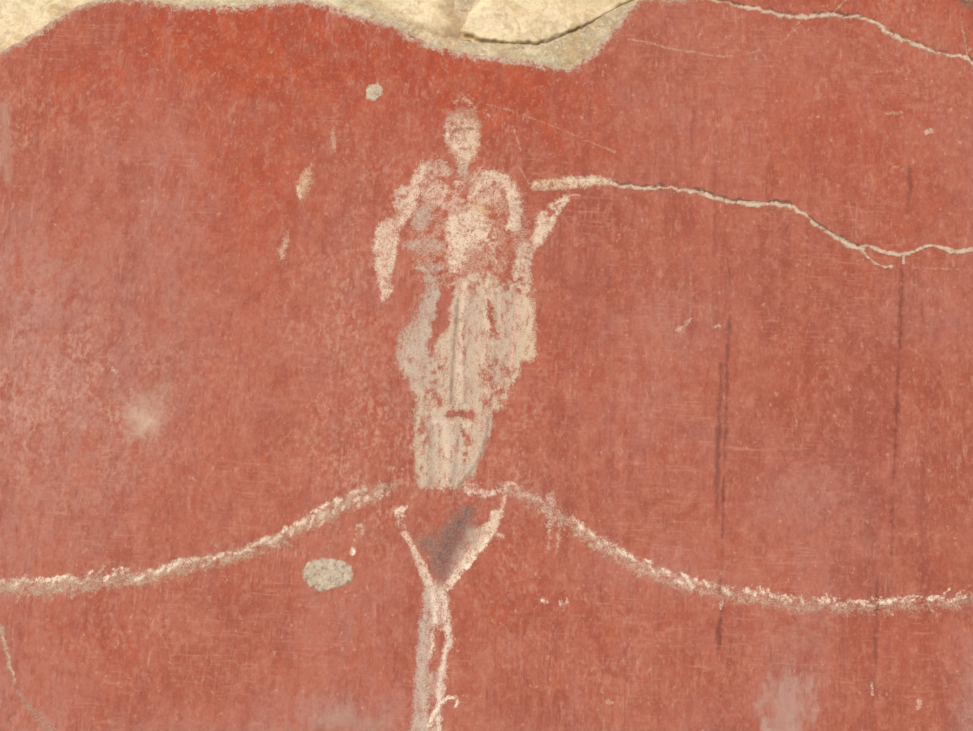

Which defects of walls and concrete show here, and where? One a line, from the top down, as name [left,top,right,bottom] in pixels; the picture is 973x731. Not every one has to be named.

crack [702,0,973,68]
peeling [366,83,383,101]
peeling [294,163,314,201]
crack [606,180,973,269]
crack [0,624,56,731]